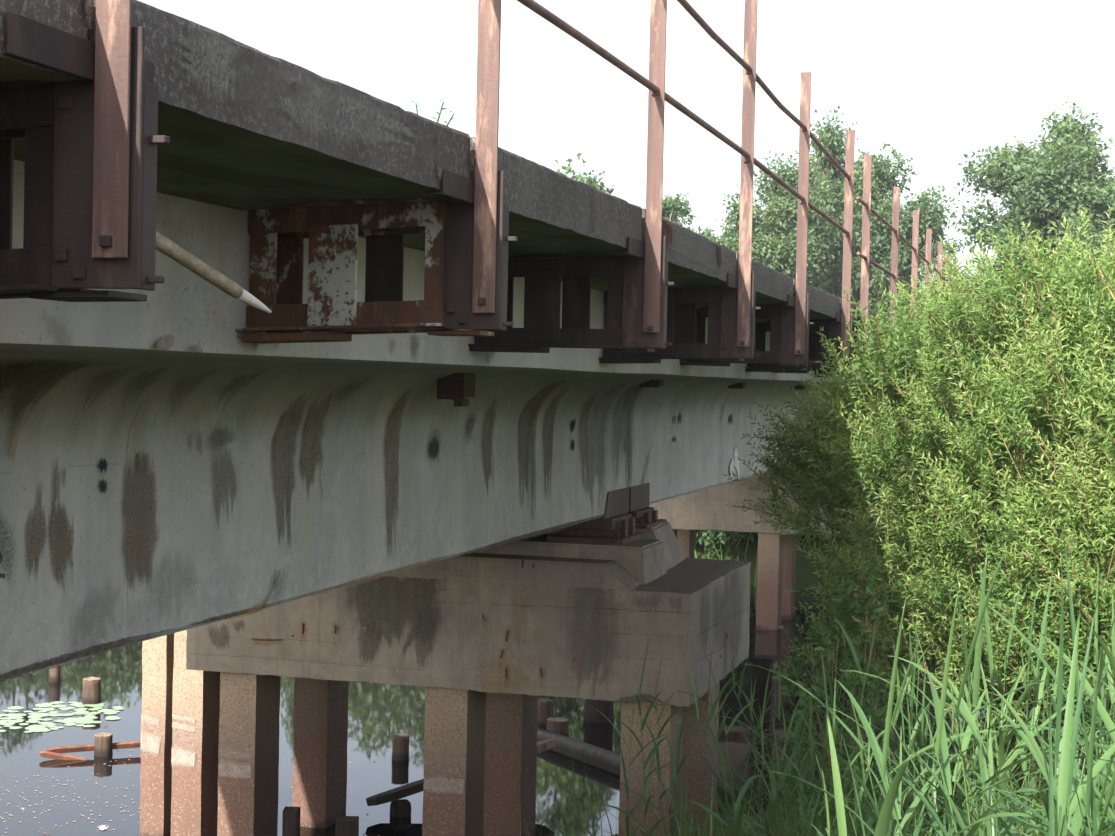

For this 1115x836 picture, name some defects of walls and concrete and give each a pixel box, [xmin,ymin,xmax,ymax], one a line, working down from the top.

water stain [26,459,74,592]
water stain [124,454,159,586]
water stain [273,395,332,543]
water stain [385,393,407,552]
water stain [519,380,565,515]
water stain [347,576,440,665]